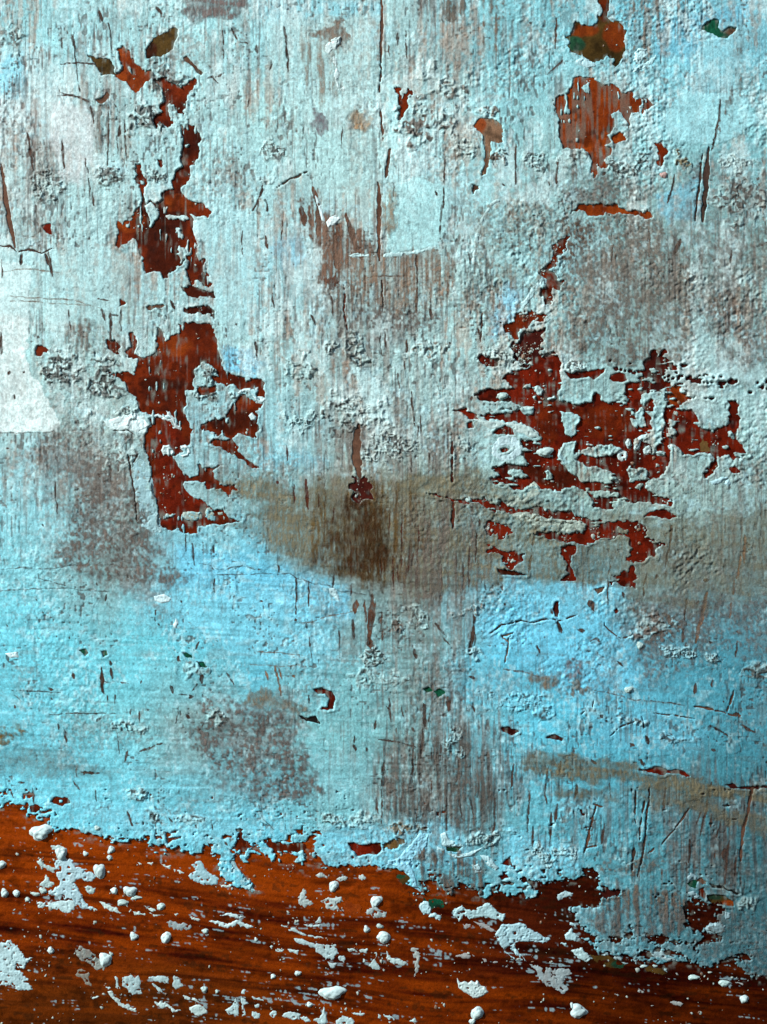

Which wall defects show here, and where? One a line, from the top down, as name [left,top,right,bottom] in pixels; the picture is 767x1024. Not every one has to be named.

peeling [565,0,627,67]
peeling [372,43,693,194]
peeling [25,28,375,535]
peeling [570,203,653,219]
peeling [698,153,767,247]
peeling [277,388,431,503]
peeling [429,236,746,594]
water stain [216,462,630,657]
peeling [0,786,767,1024]